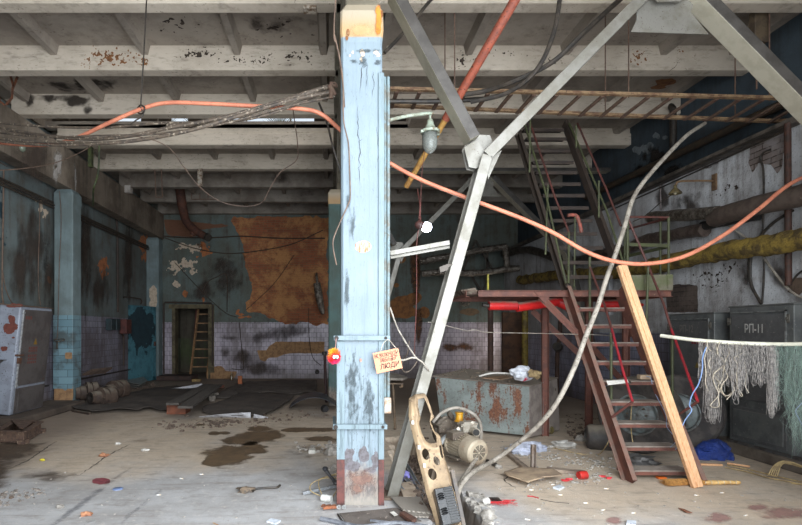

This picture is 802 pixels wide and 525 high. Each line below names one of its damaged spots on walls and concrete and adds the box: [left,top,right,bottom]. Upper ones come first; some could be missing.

flaking render [748,133,784,173]
flaking render [164,215,329,326]